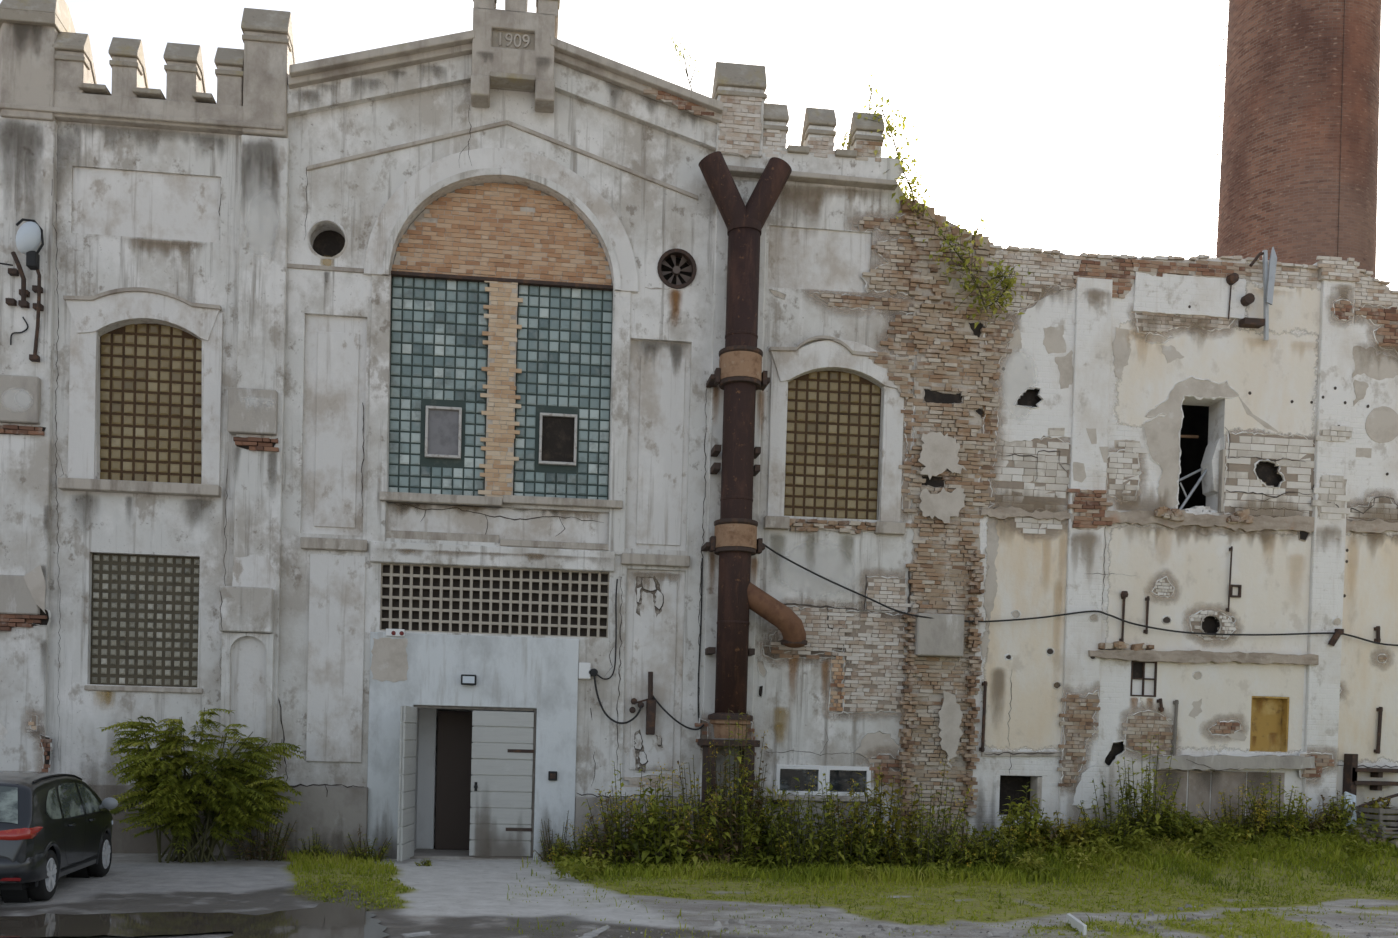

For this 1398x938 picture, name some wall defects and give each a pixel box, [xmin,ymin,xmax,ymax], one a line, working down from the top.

flaking render [807,212,1398,659]
crack [1225,427,1398,514]
flaking render [789,519,876,534]
spalling [1052,681,1178,791]
spalling [1189,699,1247,741]